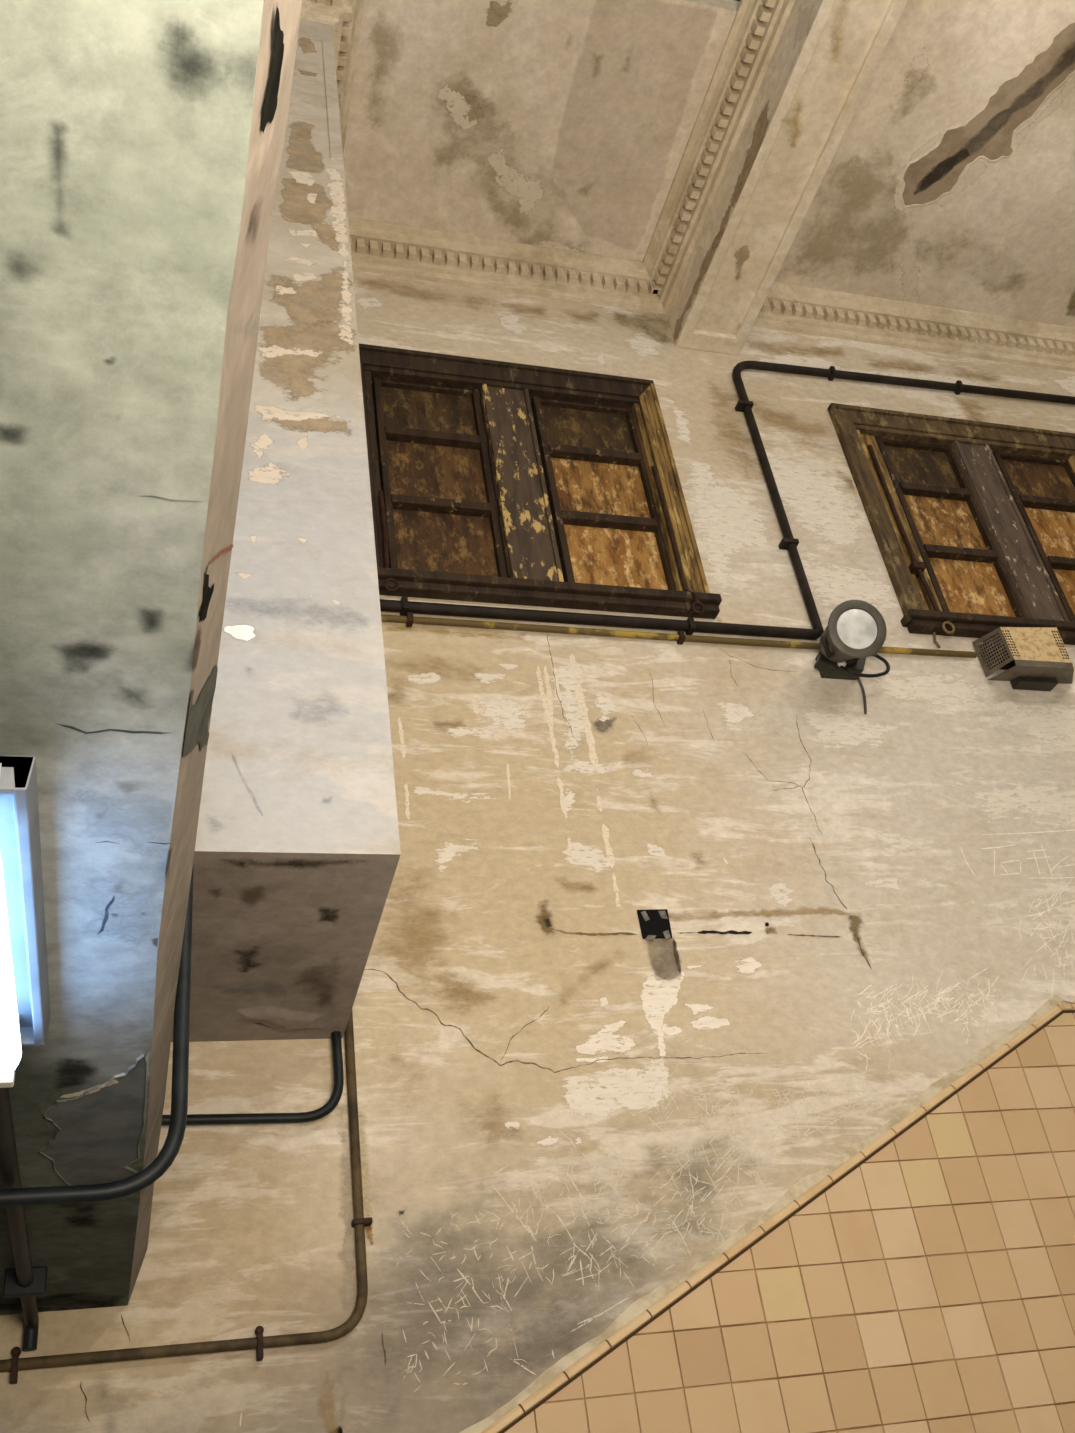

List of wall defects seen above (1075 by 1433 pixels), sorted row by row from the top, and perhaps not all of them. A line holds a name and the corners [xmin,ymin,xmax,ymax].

leakage [437,83,483,130]
spalling [899,19,1075,208]
leakage [487,148,544,215]
peeling [275,168,383,345]
peeling [257,345,324,358]
peeling [248,404,344,484]
peeling [440,662,530,746]
crack [547,636,580,746]
peeling [551,654,657,816]
crack [747,716,872,969]
crack [364,969,763,1073]
peeling [561,965,730,1118]